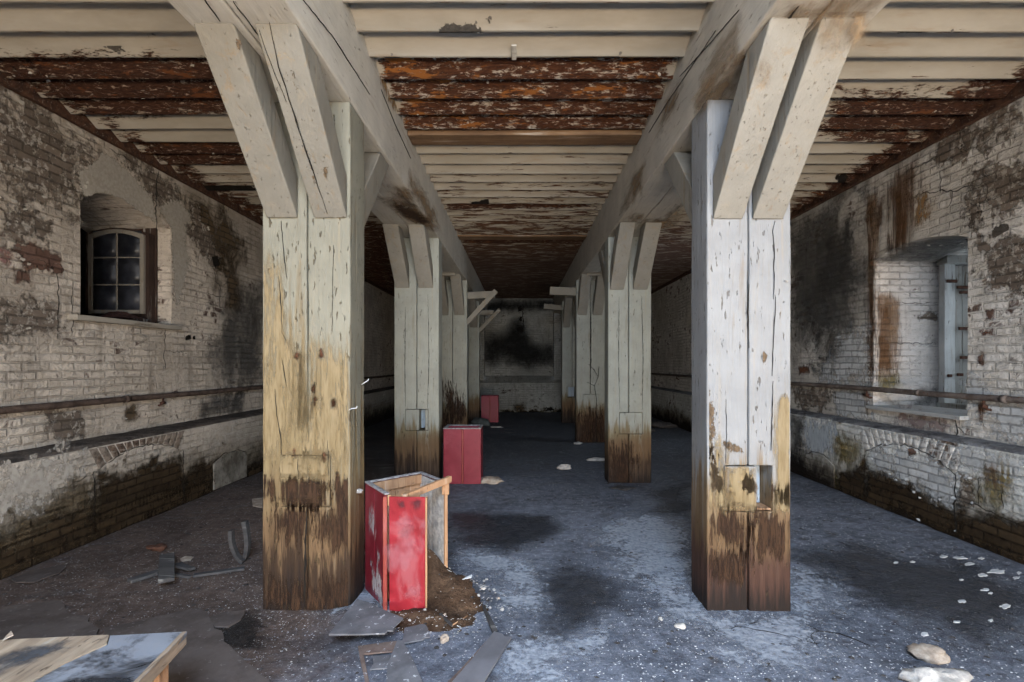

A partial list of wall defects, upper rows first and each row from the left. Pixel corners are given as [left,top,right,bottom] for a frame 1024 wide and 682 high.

peeling [0,85,102,348]
damp [189,201,262,418]
crack [204,0,328,214]
peeling [439,16,492,34]
corrosion [862,157,930,398]
corrosion [790,63,1024,214]
damp [790,181,1024,565]
peeling [933,103,1024,299]
damp [0,441,216,580]
damp [452,513,556,549]
damp [545,567,615,635]
damp [709,483,1024,638]